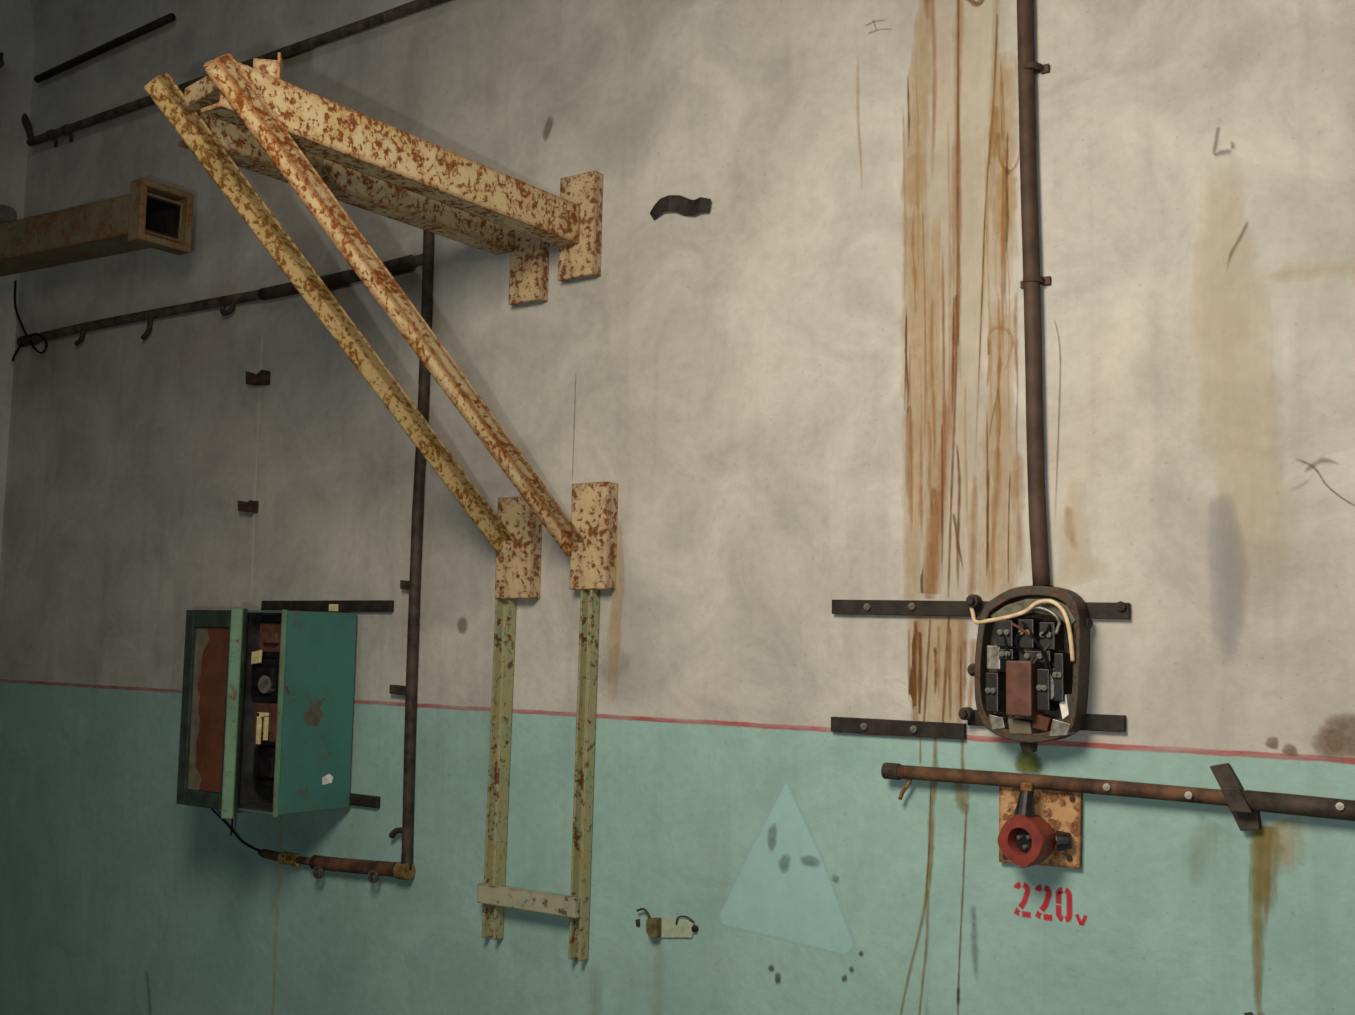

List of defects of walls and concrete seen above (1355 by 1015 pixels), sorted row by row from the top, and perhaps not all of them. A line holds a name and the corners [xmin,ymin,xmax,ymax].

rust [981,28,1008,313]
rust [938,185,1017,590]
rust [911,620,961,722]
water stain [1318,718,1355,756]